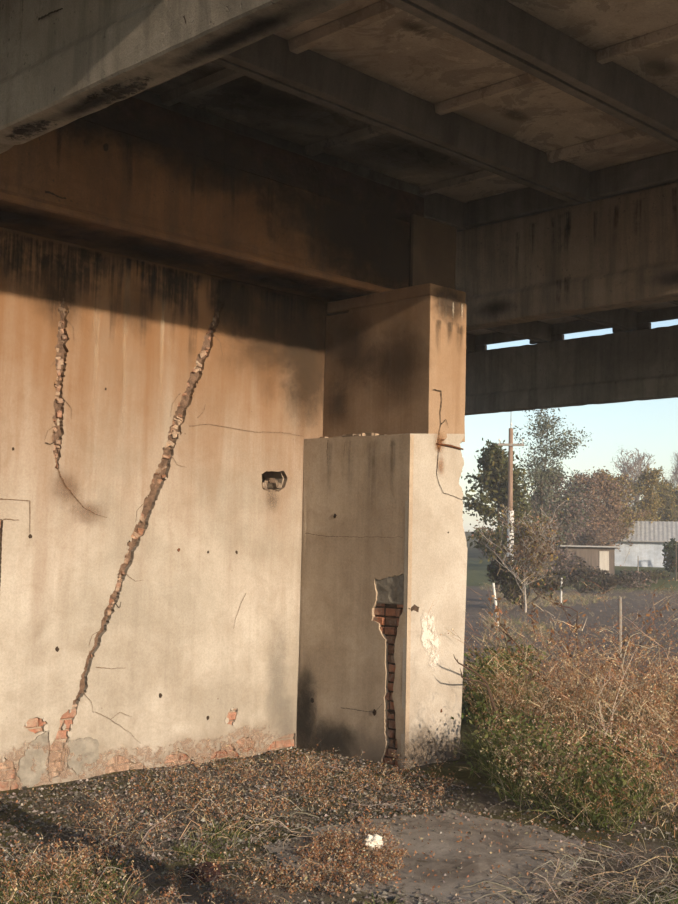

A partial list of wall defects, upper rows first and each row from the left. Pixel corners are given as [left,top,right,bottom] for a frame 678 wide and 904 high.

water stain [184,16,287,63]
water stain [63,78,150,116]
water stain [5,120,57,140]
water stain [0,232,200,302]
crack [44,262,304,780]
spalling [373,574,404,767]
water stain [296,674,351,755]
spalling [0,758,19,791]
spalling [24,704,77,778]
spalling [105,755,146,773]
spalling [267,734,296,751]